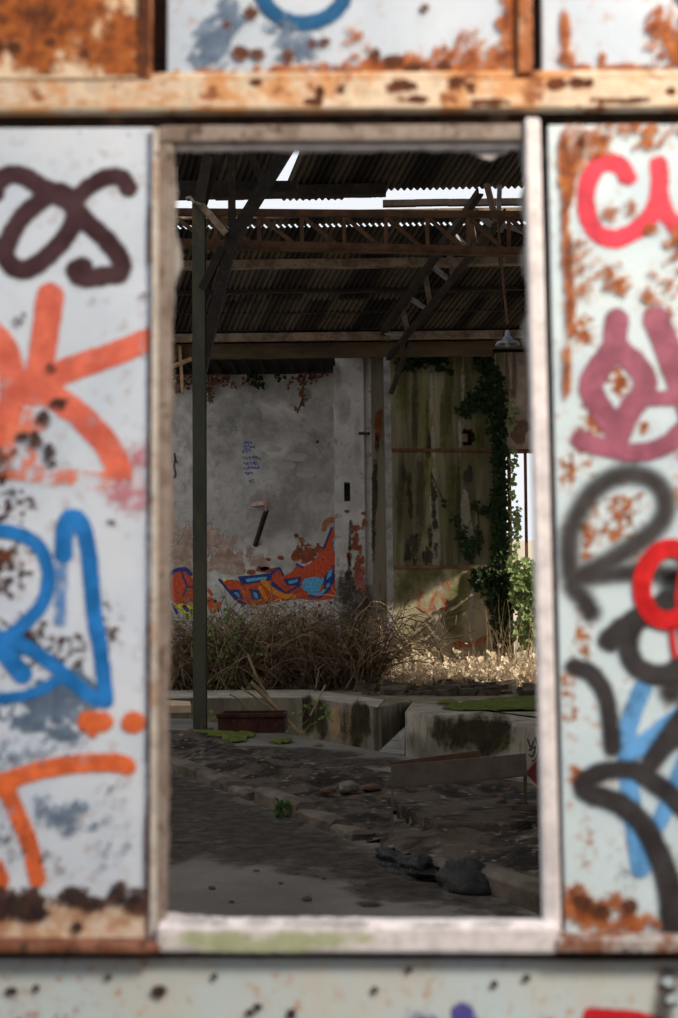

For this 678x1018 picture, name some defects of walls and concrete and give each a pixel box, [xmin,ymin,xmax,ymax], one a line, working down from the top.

rust [0,0,347,107]
rust [192,0,517,107]
rust [545,1,678,104]
rust [557,123,678,399]
leakage [397,357,473,565]
rust [557,449,593,489]
spalling [171,521,193,570]
spalling [207,519,323,575]
rust [0,587,151,938]
leakage [430,712,511,757]
rust [564,882,662,933]
rust [151,985,167,998]